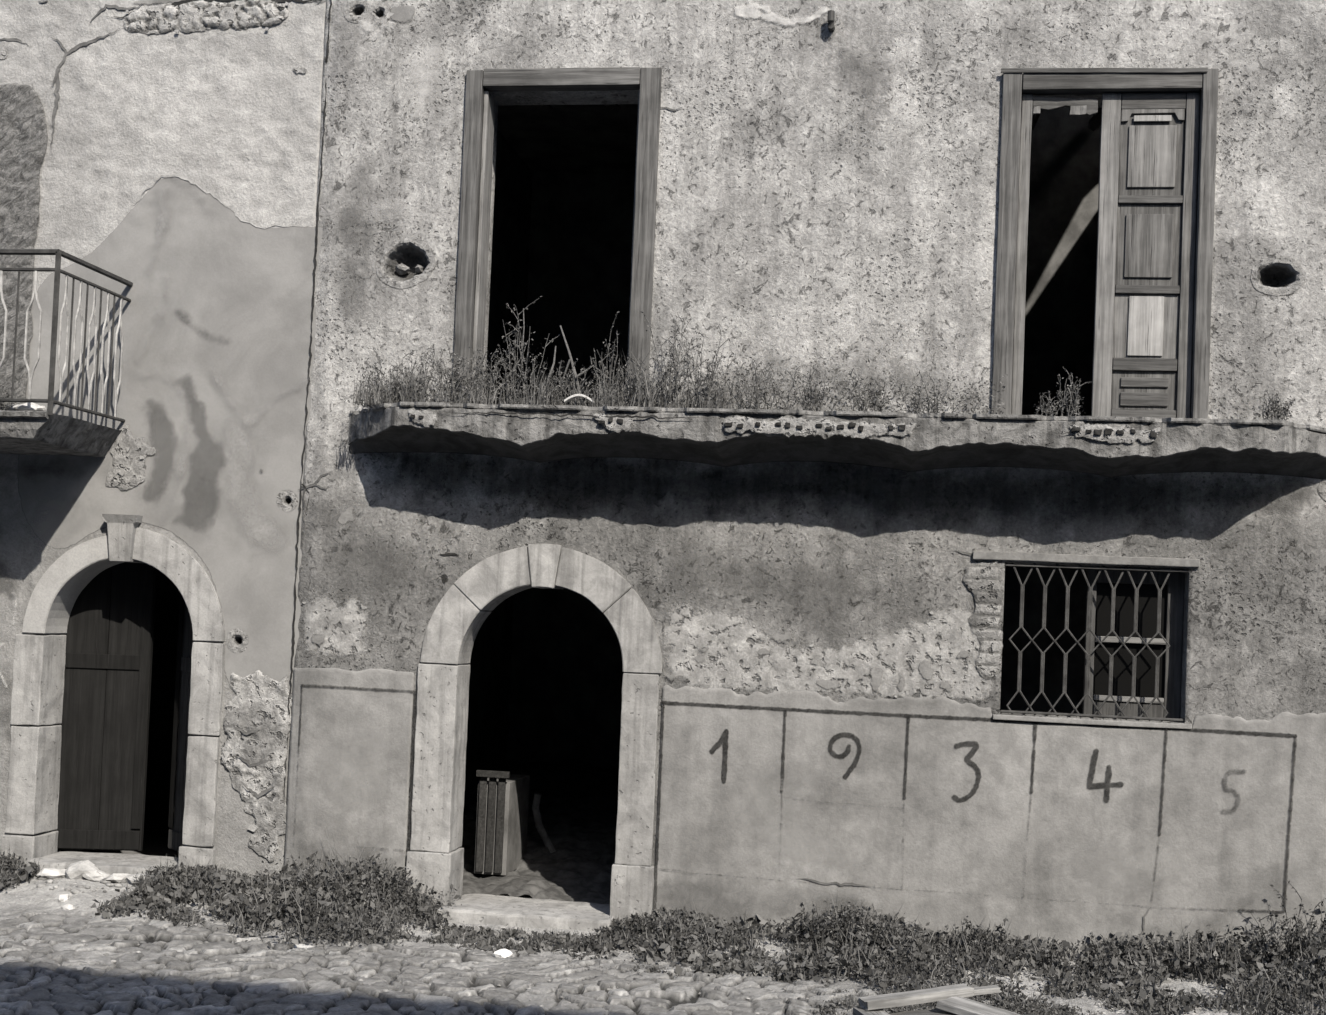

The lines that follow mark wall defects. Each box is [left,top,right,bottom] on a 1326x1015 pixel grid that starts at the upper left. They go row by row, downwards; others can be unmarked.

crack [0,0,239,154]
spalling [123,0,289,34]
water stain [148,379,283,546]
crack [271,0,333,804]
crack [448,411,719,419]
peeling [663,562,1004,699]
flaking render [220,670,293,862]